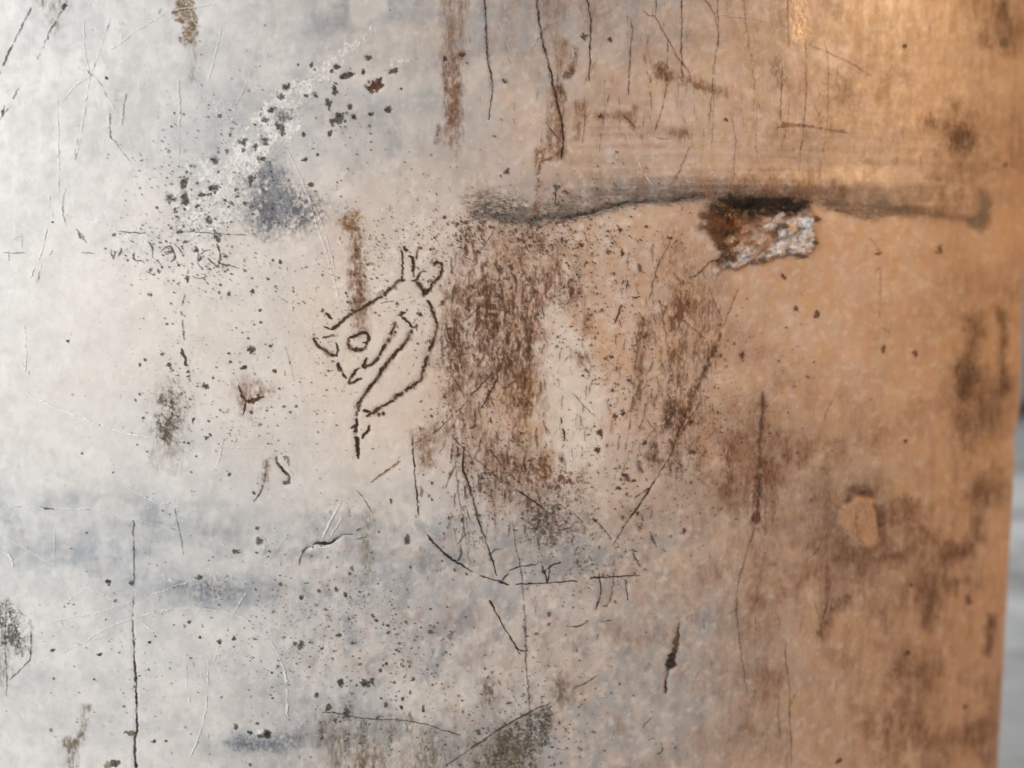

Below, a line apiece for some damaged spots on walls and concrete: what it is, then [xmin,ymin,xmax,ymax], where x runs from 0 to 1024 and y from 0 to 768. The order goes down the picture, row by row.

rust [436,0,465,146]
rust [342,211,367,333]
rust [455,285,536,348]
spalling [690,193,822,279]
rust [499,435,569,492]
crack [124,522,138,768]